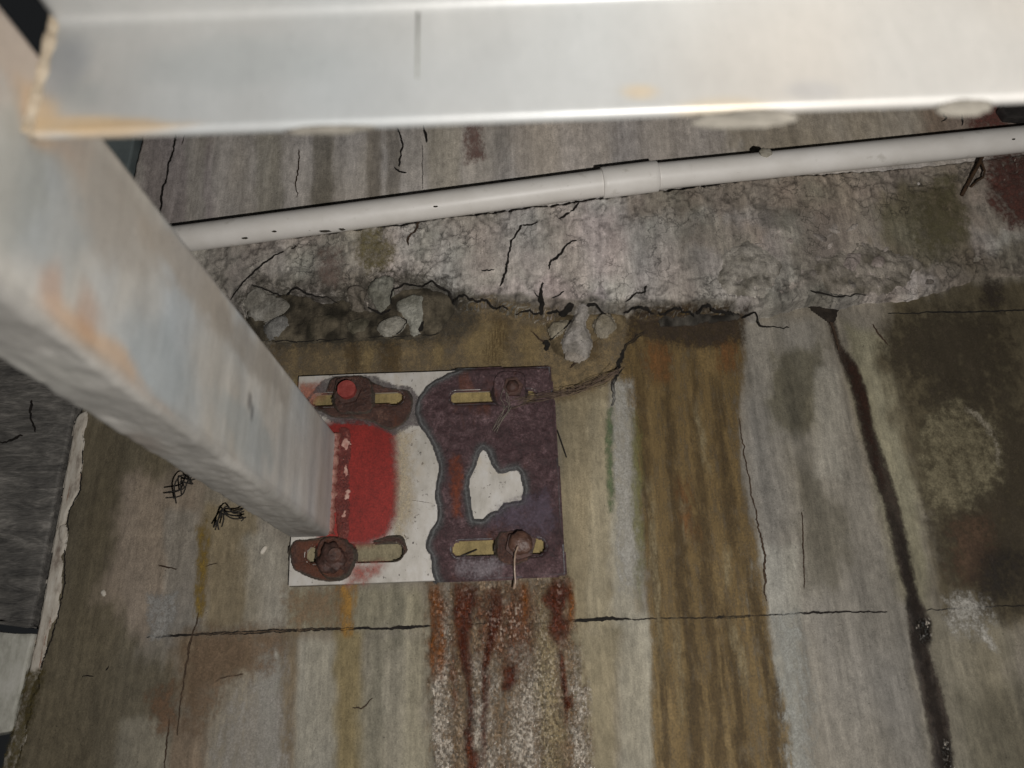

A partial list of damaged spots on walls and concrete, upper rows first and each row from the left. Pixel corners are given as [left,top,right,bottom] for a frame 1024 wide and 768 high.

crack [231,246,297,299]
spalling [242,275,455,344]
crack [406,221,420,246]
crack [453,201,580,316]
spalling [531,302,626,368]
crack [611,286,789,406]
crack [873,309,1024,345]
water stain [883,278,1024,650]
rust [288,536,356,635]
rust [307,366,592,768]
crack [146,419,887,768]
water stain [829,321,953,768]